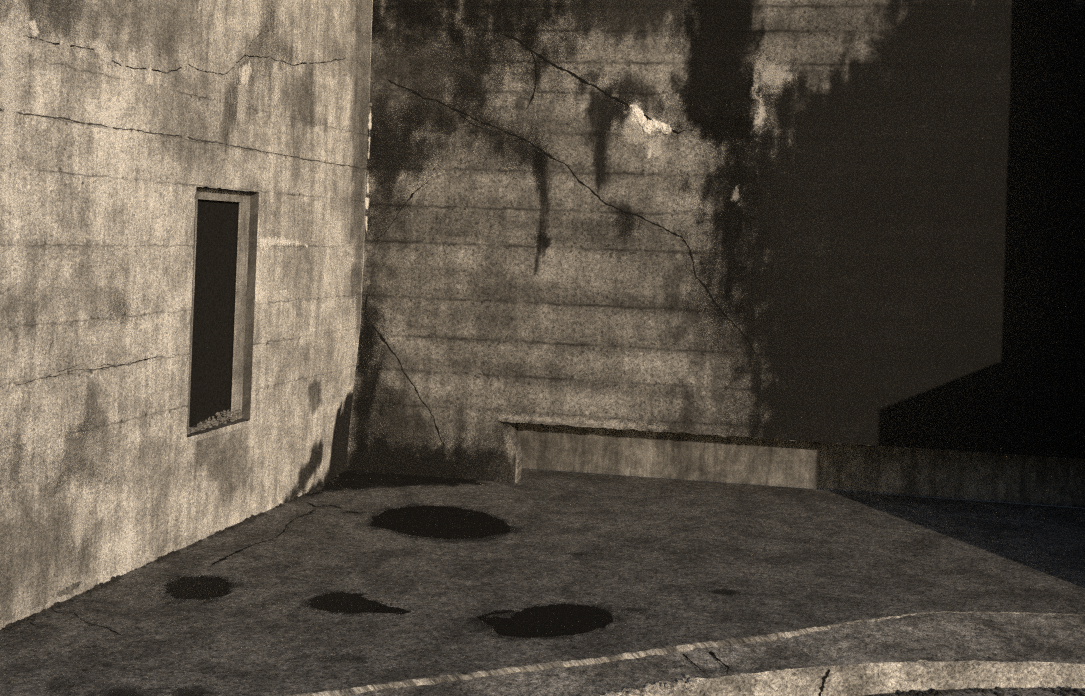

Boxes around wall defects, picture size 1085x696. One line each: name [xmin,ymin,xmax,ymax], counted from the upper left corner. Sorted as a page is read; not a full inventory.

crack [0,31,355,167]
crack [370,181,428,245]
damp [365,17,574,274]
crack [389,33,758,356]
spalling [629,105,672,134]
damp [561,0,1085,459]
crack [0,341,157,387]
crack [365,292,445,446]
crack [209,502,364,567]